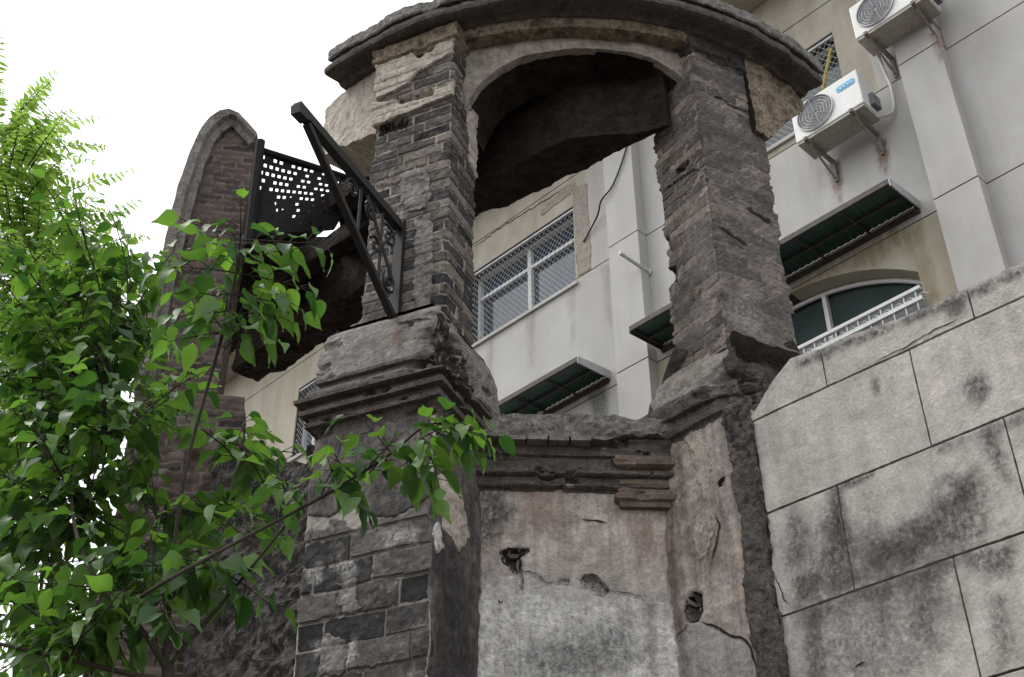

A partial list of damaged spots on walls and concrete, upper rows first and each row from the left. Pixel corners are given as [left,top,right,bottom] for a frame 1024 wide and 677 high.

flaking render [432,474,470,554]
flaking render [477,395,790,677]
leakage [797,474,872,599]
leakage [863,480,987,629]
leakage [969,547,1012,572]
crack [676,621,756,667]